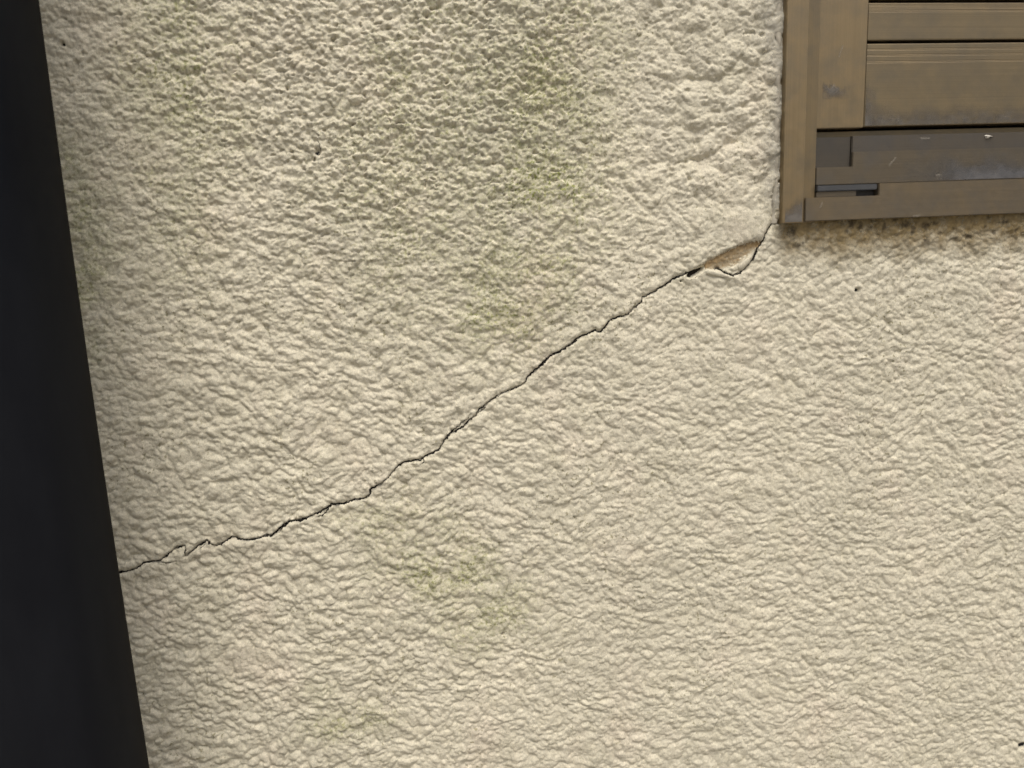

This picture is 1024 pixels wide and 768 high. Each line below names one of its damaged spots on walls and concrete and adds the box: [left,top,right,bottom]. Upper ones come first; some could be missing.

crack [119,223,772,573]
spalling [680,241,761,282]